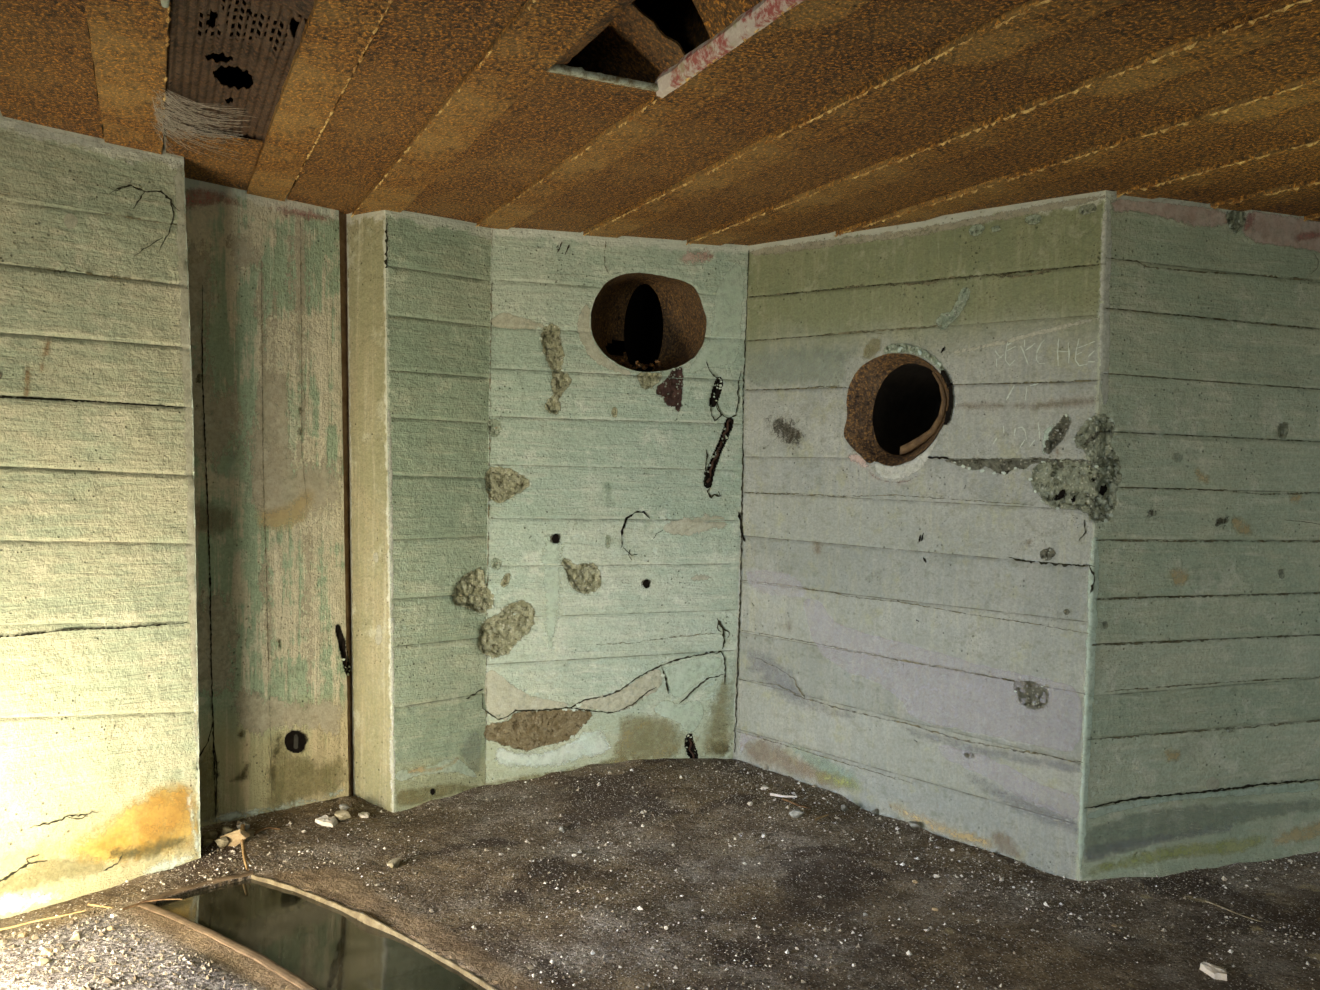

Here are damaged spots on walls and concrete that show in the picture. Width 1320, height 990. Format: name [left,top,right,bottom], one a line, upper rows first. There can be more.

crack [0,184,183,282]
spalling [539,324,572,414]
peeling [577,305,662,389]
crack [0,285,218,824]
spalling [485,465,531,503]
crack [464,229,1320,782]
spalling [751,194,1320,870]
spalling [452,558,722,752]
spalling [684,733,698,759]
crack [0,811,98,882]